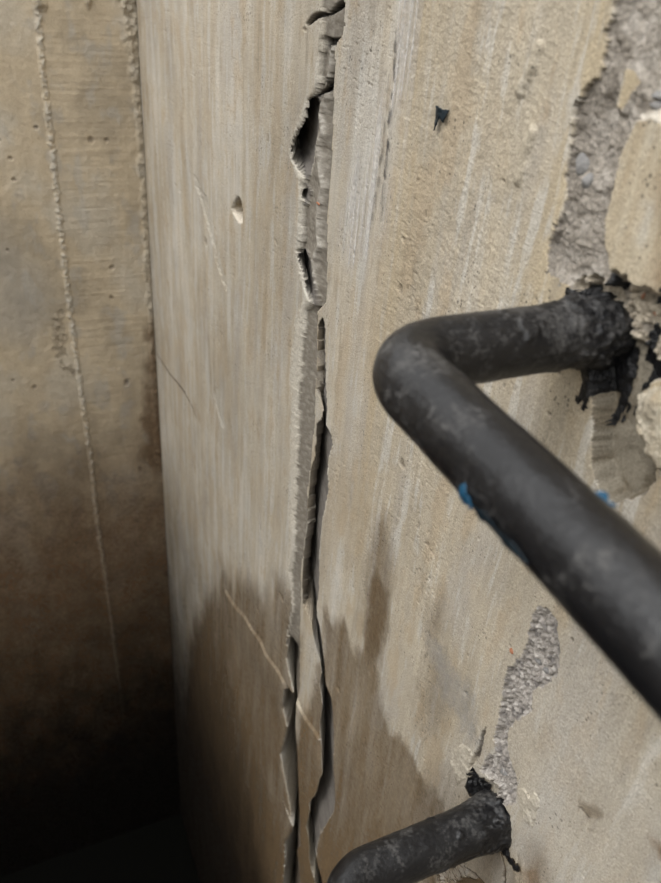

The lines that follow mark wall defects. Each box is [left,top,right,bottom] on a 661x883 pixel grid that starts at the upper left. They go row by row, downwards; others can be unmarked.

crack [279,0,345,883]
spalling [545,0,661,504]
peeling [450,606,561,827]